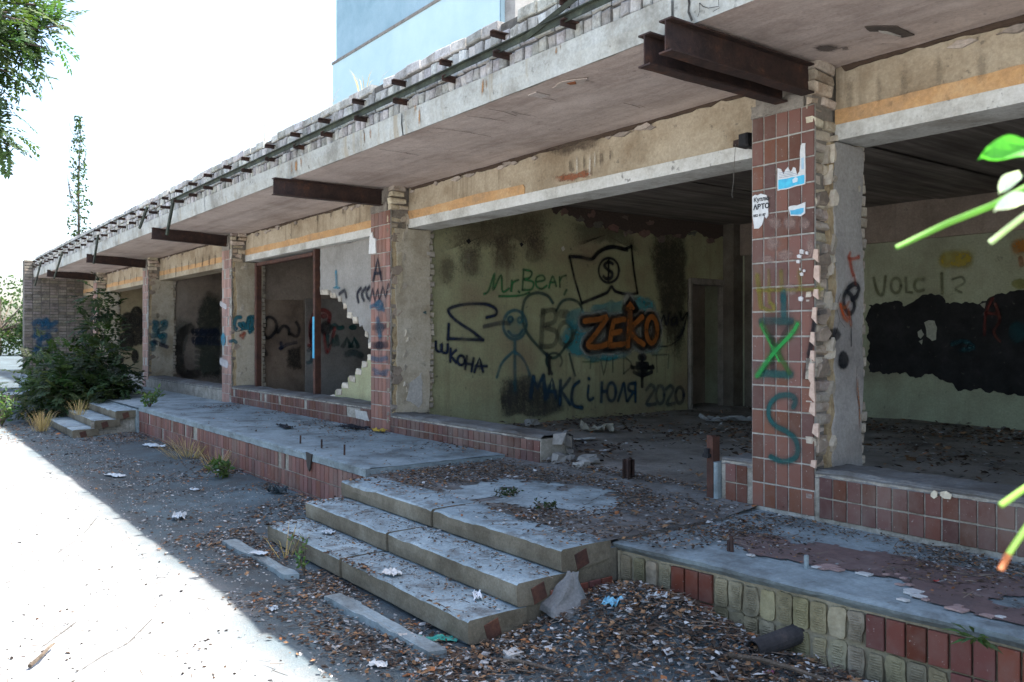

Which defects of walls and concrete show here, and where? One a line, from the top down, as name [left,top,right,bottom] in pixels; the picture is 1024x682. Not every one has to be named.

flaking render [229,203,361,400]
spalling [320,289,371,396]
peeling [387,304,423,422]
leakage [461,216,541,274]
spalling [369,95,744,291]
flaking render [796,15,1024,468]
peeling [811,564,930,602]
peeling [944,604,1006,619]